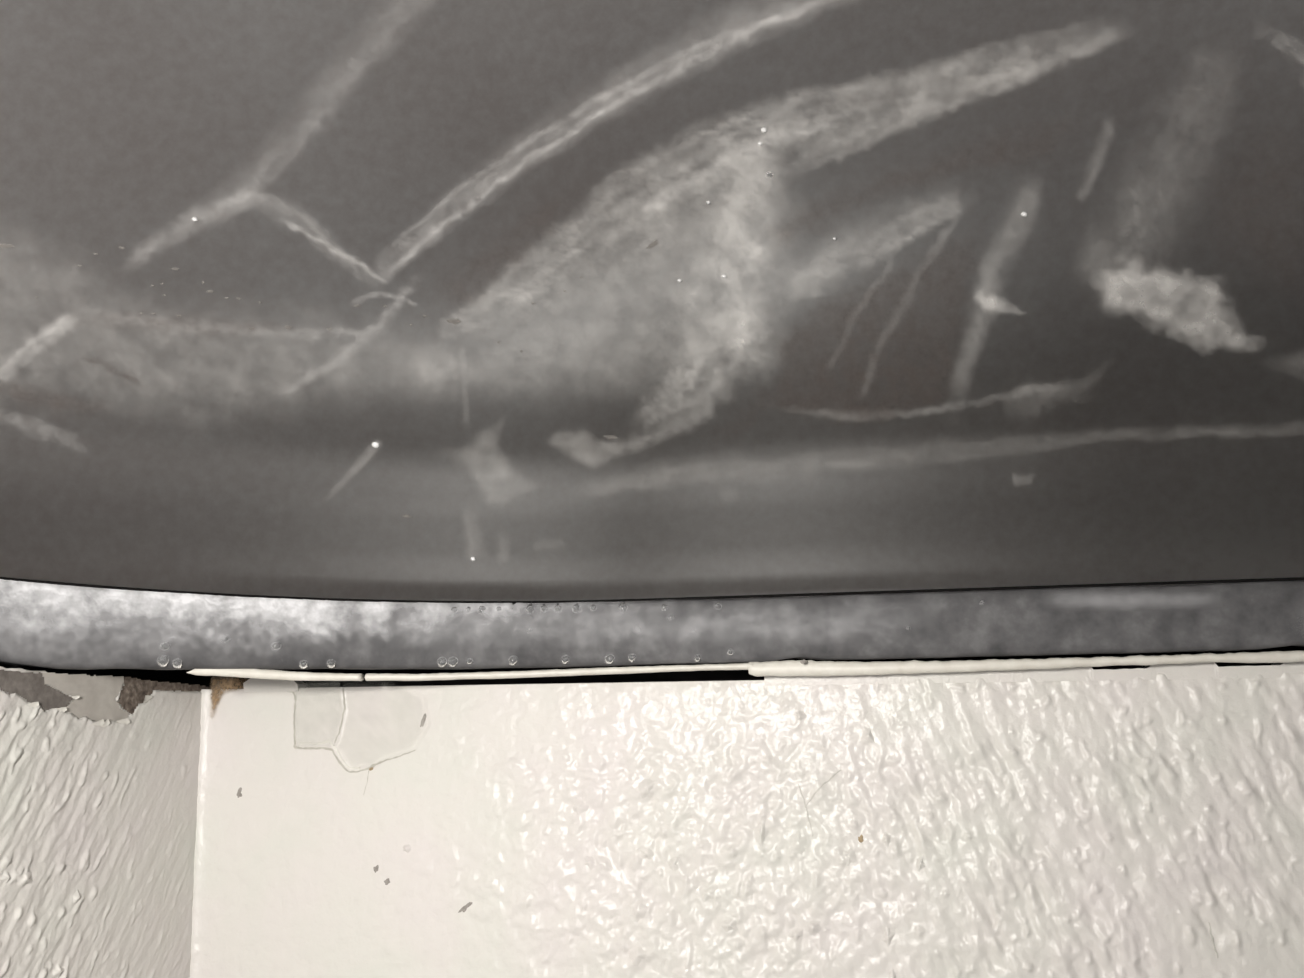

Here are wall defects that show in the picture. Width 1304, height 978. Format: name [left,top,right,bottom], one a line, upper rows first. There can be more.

peeling [0,670,211,727]